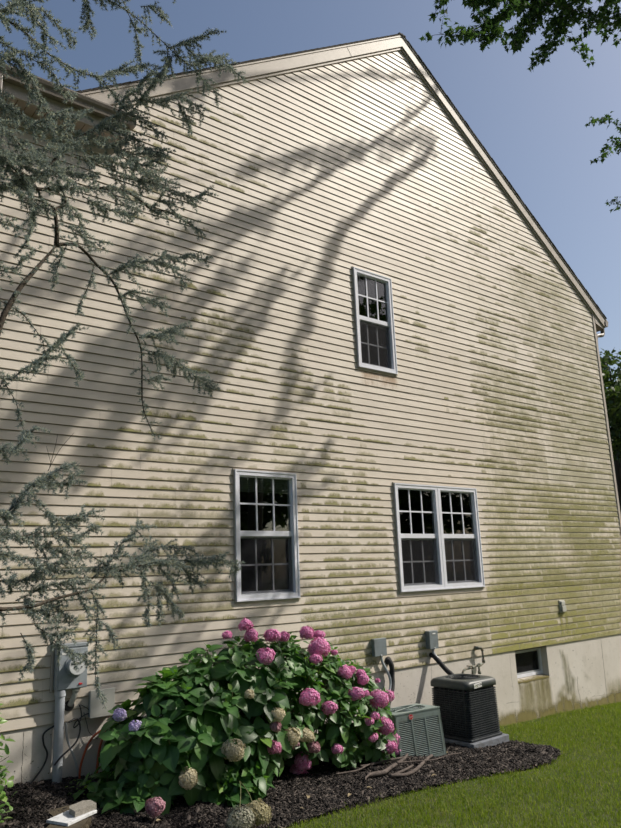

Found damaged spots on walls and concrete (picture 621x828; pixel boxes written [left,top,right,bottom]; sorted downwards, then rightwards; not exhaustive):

damp [498,692,621,727]